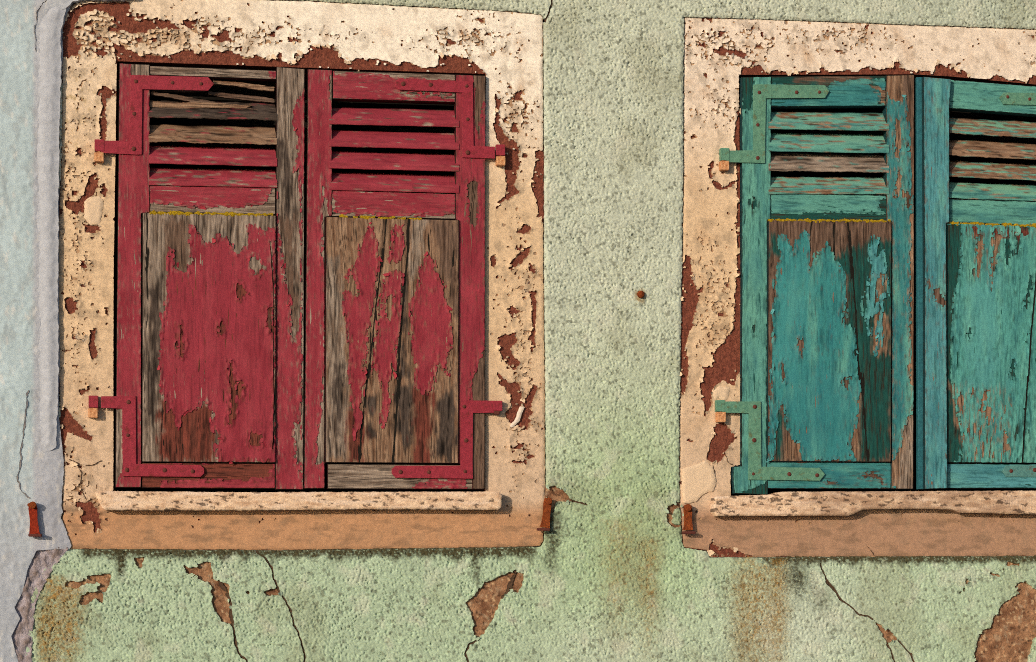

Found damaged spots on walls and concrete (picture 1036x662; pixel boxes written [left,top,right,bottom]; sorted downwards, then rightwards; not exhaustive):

peeling [62,1,486,75]
peeling [699,31,1036,85]
peeling [493,94,520,209]
peeling [494,290,539,430]
peeling [664,161,740,528]
crack [218,580,248,662]
crack [256,550,306,662]
crack [464,640,477,662]
crack [501,570,516,598]
crack [820,563,873,619]
crack [887,640,915,662]
spalling [971,579,1036,662]